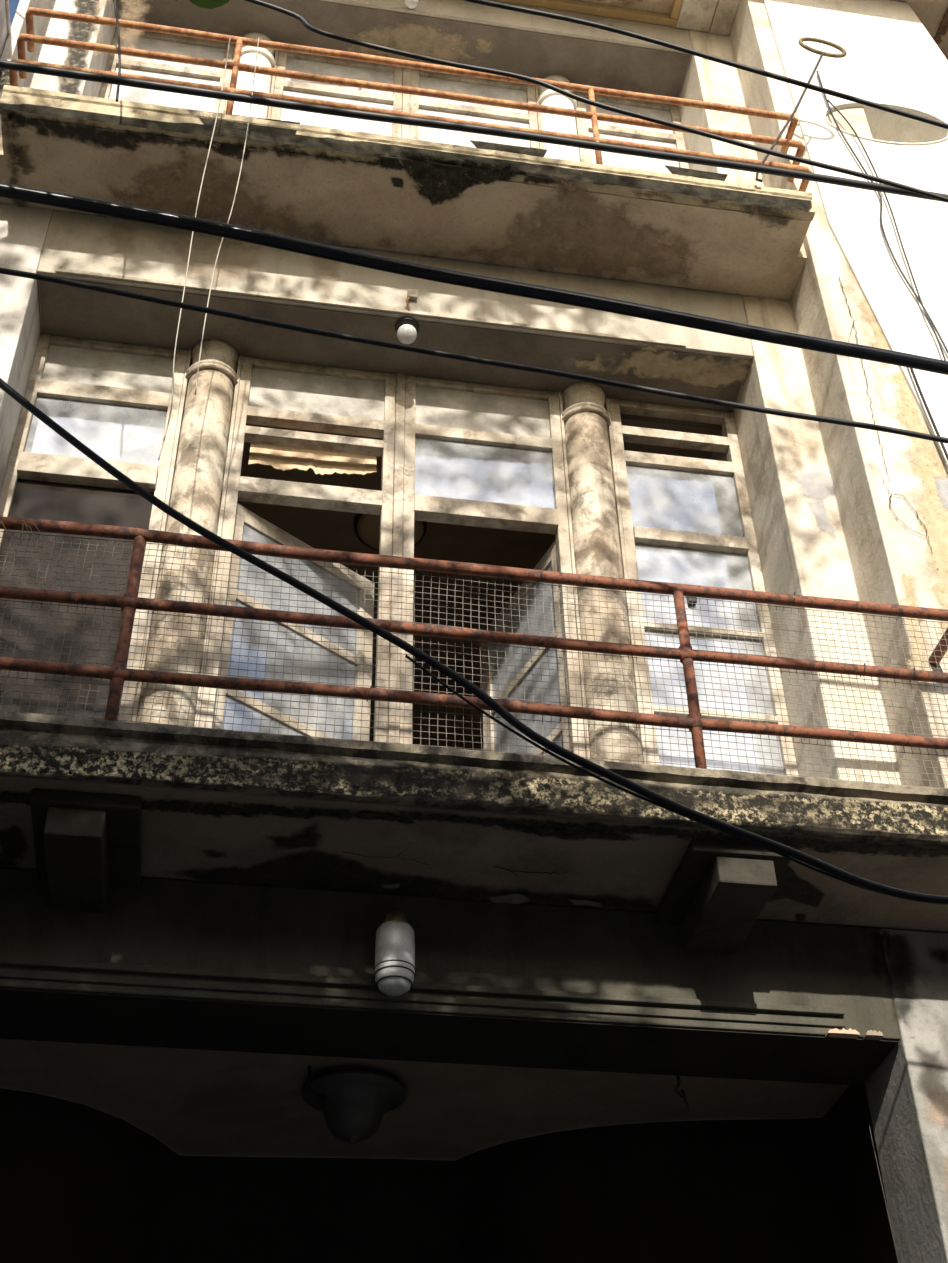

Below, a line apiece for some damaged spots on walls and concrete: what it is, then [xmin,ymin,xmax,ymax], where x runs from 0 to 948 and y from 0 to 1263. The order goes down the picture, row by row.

corrosion [934,9,948,44]
damp [0,103,812,282]
peeling [574,343,752,388]
crack [839,277,936,562]